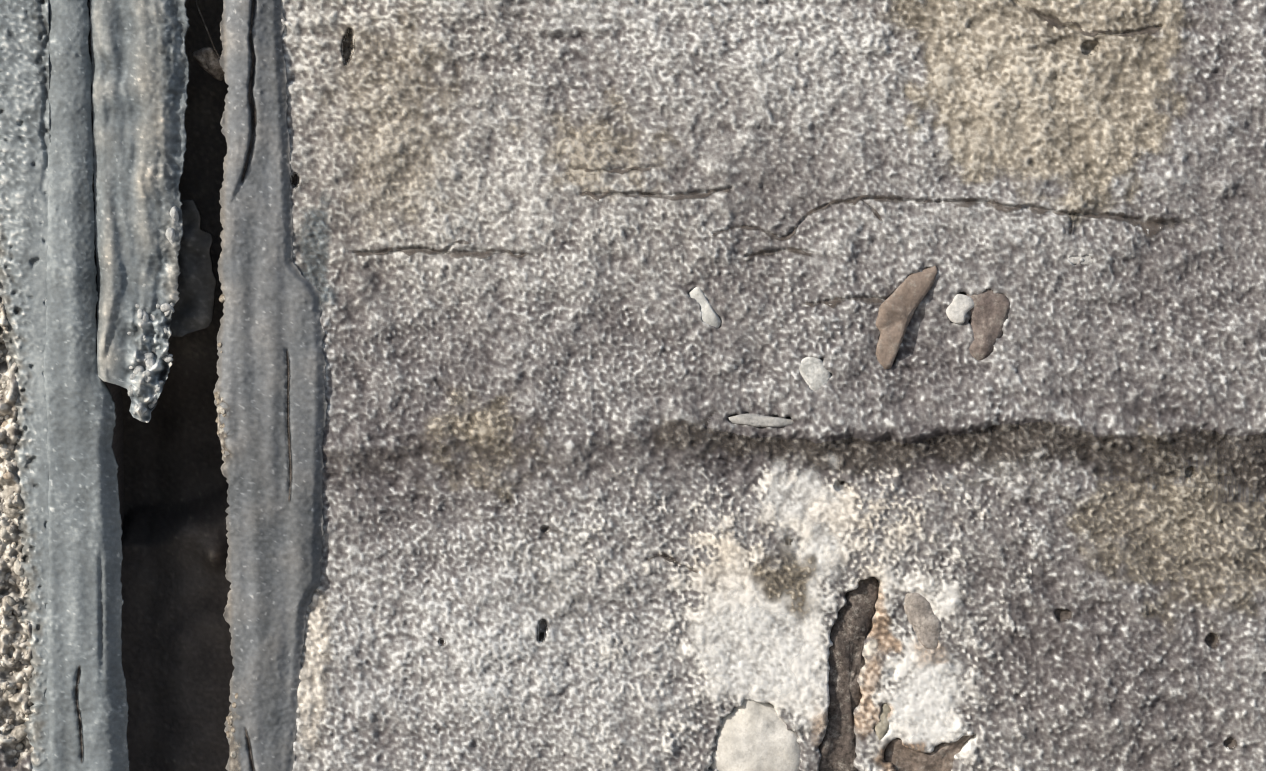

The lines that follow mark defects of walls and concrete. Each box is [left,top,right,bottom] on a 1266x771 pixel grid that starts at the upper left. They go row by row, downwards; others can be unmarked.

crack [1028,8,1160,37]
crack [241,0,256,181]
water stain [890,0,1185,222]
crack [574,167,729,201]
peeling [165,206,179,245]
crack [713,195,925,260]
crack [957,199,1176,236]
water stain [494,413,1266,771]